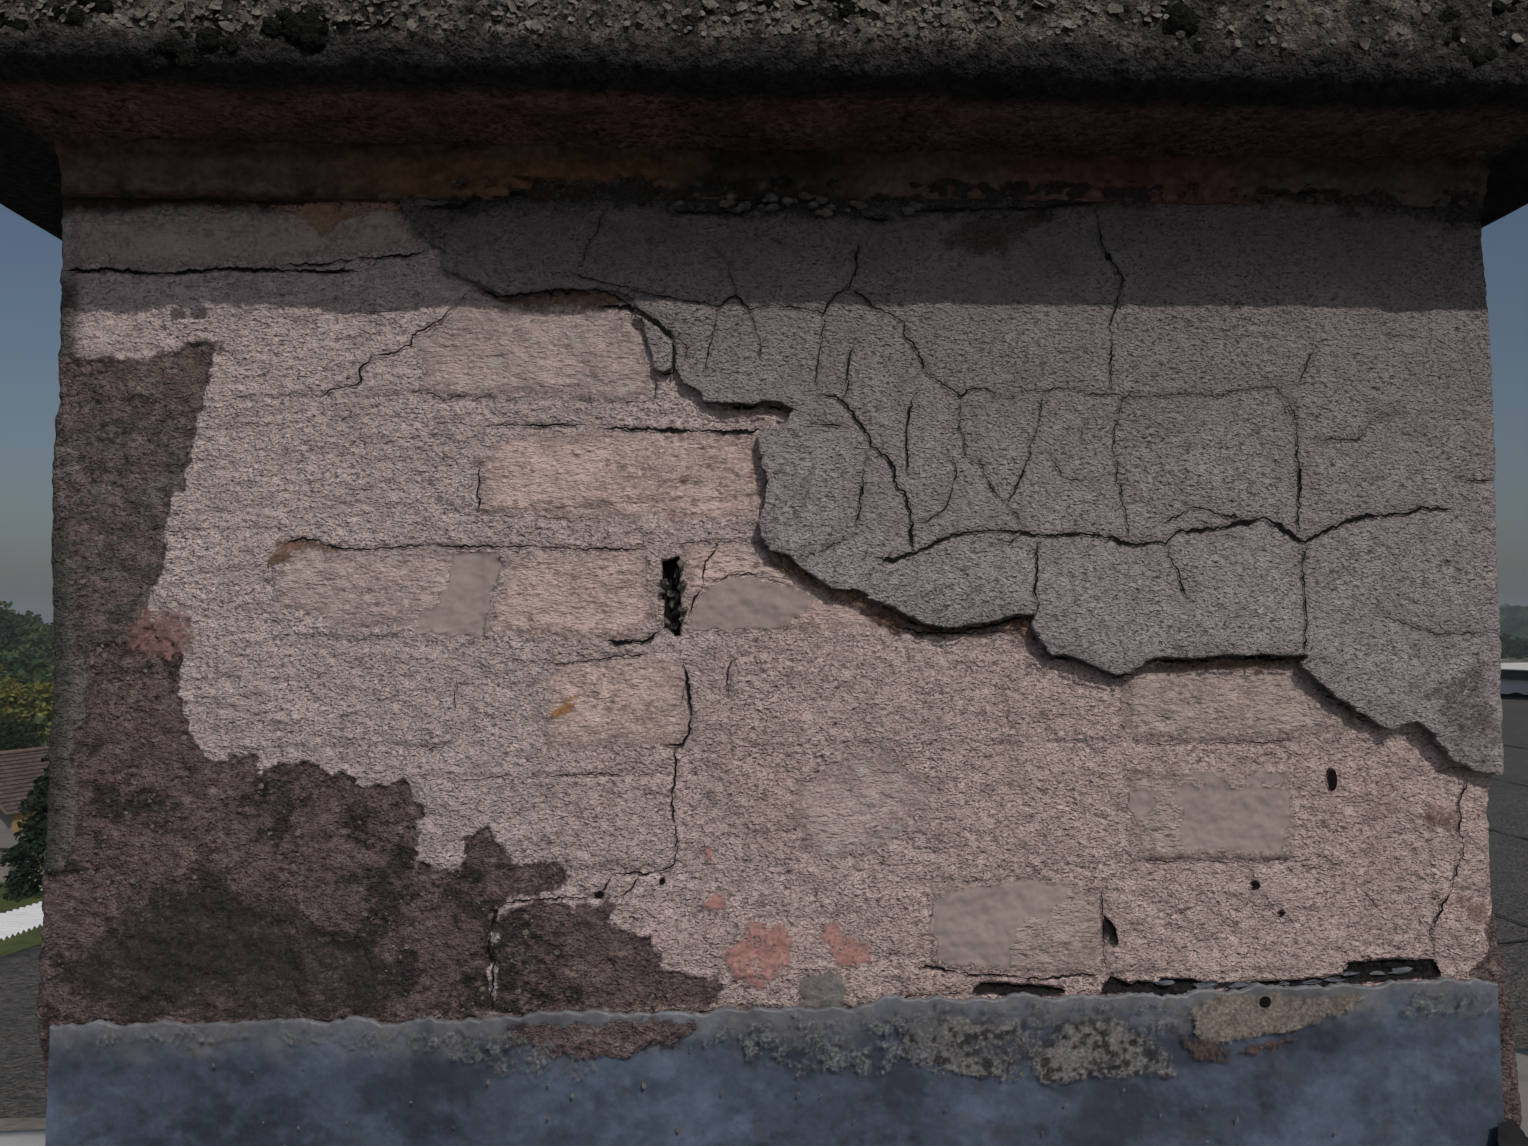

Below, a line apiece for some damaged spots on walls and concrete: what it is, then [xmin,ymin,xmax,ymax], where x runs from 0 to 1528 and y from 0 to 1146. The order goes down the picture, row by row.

crack [64,191,527,275]
spalling [419,304,673,402]
crack [266,194,1497,731]
peeling [36,340,763,1113]
crack [1140,739,1288,747]
crack [314,656,744,1022]
crack [904,859,1293,998]